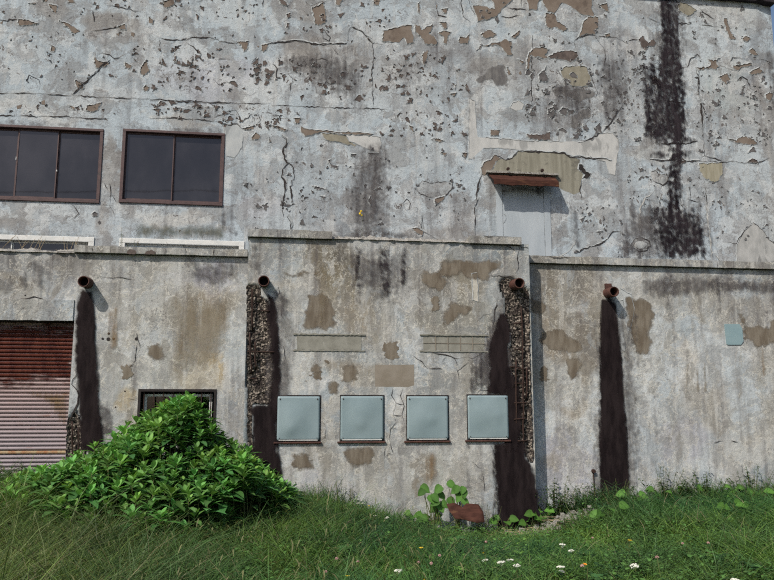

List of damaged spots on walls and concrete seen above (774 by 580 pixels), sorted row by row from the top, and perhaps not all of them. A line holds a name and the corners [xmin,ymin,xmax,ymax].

crack [0,23,385,230]
peeling [110,0,660,226]
crack [474,34,768,277]
water stain [623,0,706,259]
peeling [694,17,773,165]
corrosion [0,323,74,388]
water stain [75,290,111,452]
crack [384,389,404,458]
corrosion [447,503,485,523]
water stain [470,305,540,531]
water stain [598,298,636,497]
peeling [626,297,655,354]